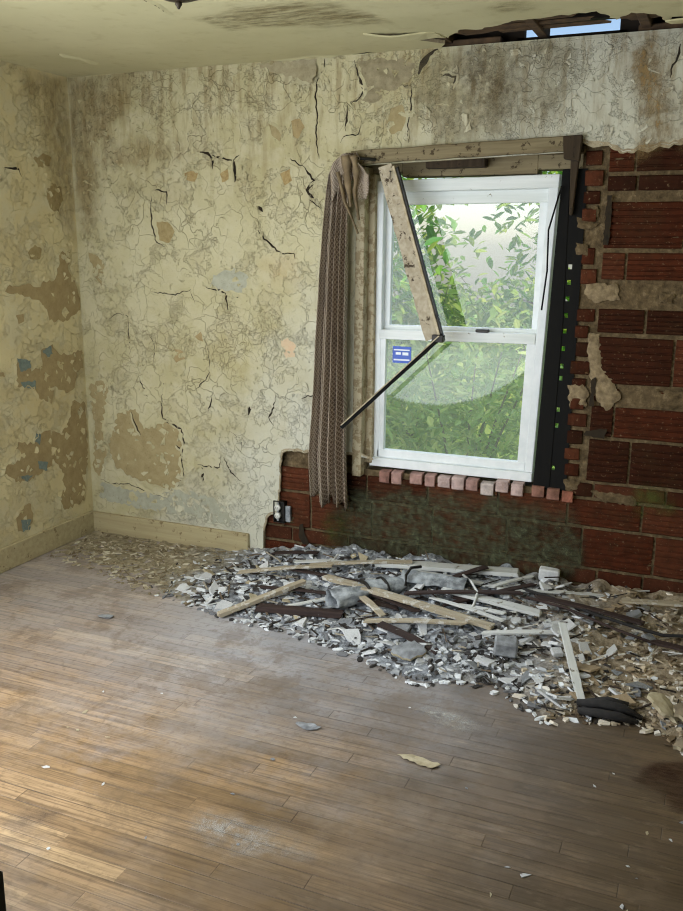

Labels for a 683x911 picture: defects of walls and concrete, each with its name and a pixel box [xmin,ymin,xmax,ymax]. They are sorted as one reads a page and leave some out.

crack [197,151,241,182]
peeling [267,115,307,144]
crack [274,52,373,208]
damp [632,43,669,151]
crack [150,189,168,247]
crack [256,206,295,259]
peeling [2,248,81,327]
peeling [0,342,188,512]
crack [97,310,241,498]
crack [246,396,279,426]
flaking render [263,138,683,593]
peeling [14,500,35,535]